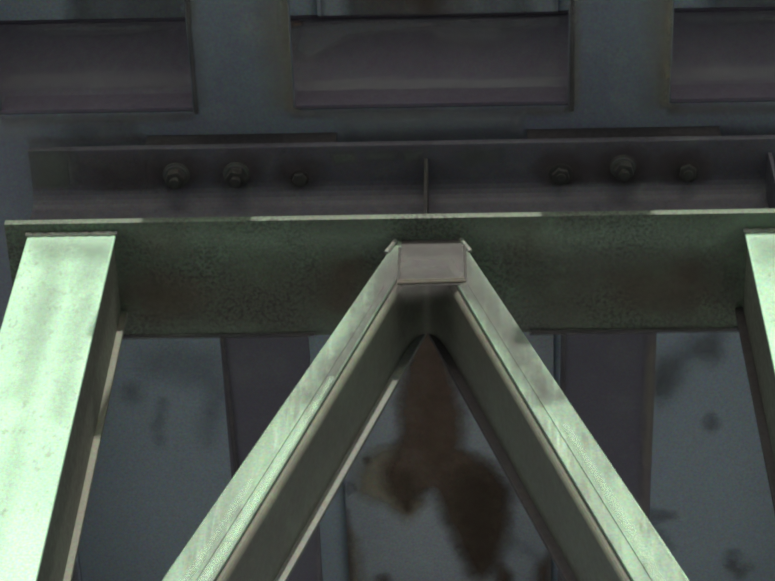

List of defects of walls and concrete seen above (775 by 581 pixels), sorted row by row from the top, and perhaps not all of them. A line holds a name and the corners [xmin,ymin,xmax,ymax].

rust [350,0,526,16]
rust [359,334,510,581]